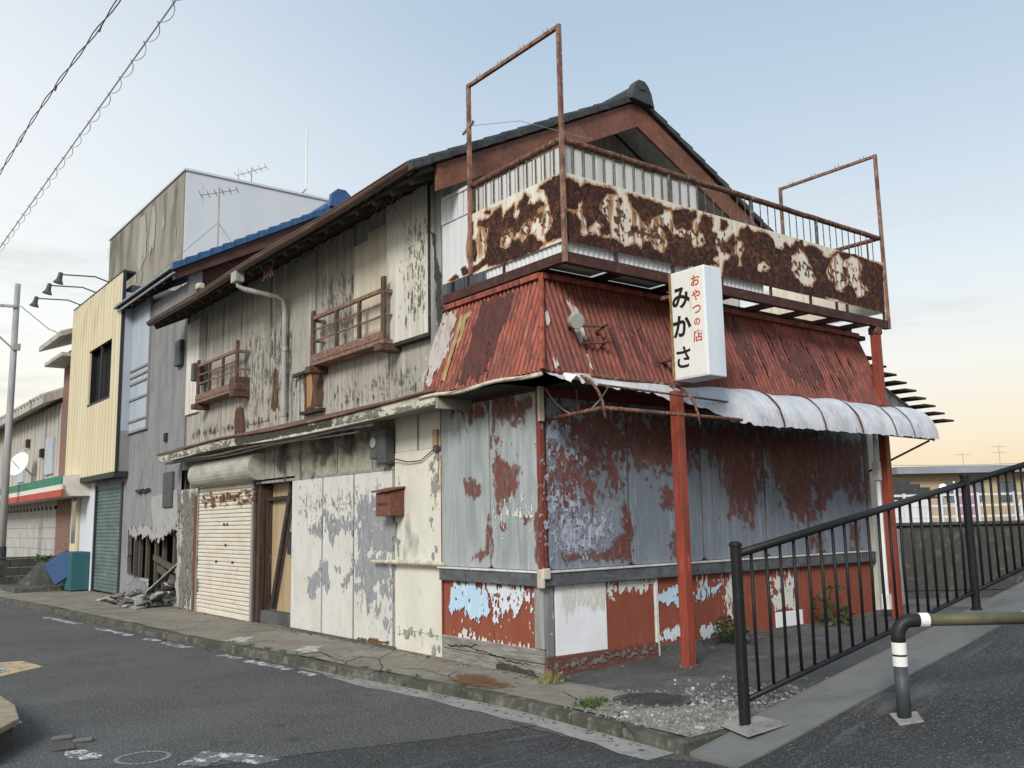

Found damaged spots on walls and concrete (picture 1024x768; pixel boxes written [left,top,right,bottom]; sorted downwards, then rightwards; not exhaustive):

rust [448,173,885,312]
peeling [330,204,475,425]
rust [454,291,514,385]
rust [606,311,662,374]
peeling [450,390,675,567]
spalling [129,489,200,608]
rust [191,488,257,611]
peeling [307,495,540,656]
crack [320,623,542,695]
peeling [607,578,679,610]
peeling [693,573,733,640]
peeling [769,569,796,611]